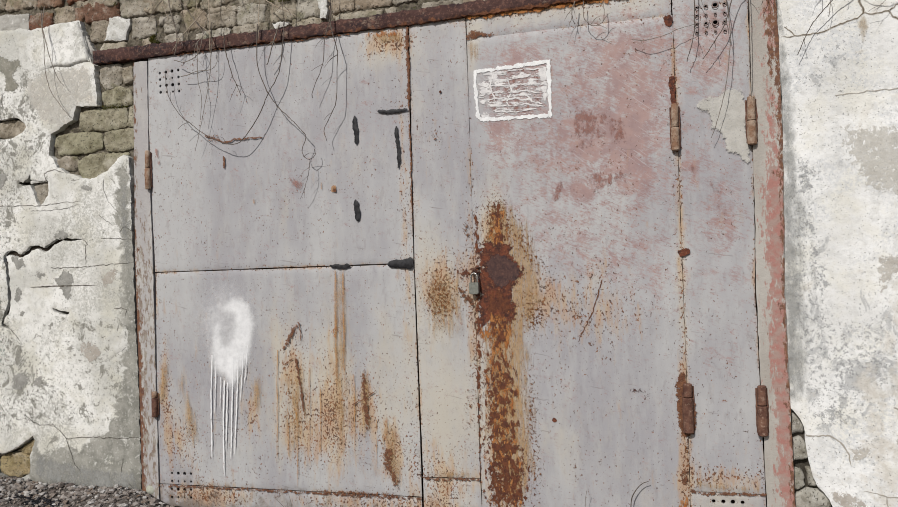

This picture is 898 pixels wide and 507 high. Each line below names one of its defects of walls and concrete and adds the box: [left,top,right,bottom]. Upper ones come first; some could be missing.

corrosion [178,34,350,56]
corrosion [465,0,609,40]
crack [781,0,898,38]
spalling [0,0,486,191]
peeling [574,112,622,145]
crack [6,189,130,281]
spalling [0,439,35,477]
corrosion [159,369,422,503]
corrosion [276,322,321,452]
corrosion [419,191,550,507]
corrosion [674,372,767,507]
spalling [791,409,866,507]